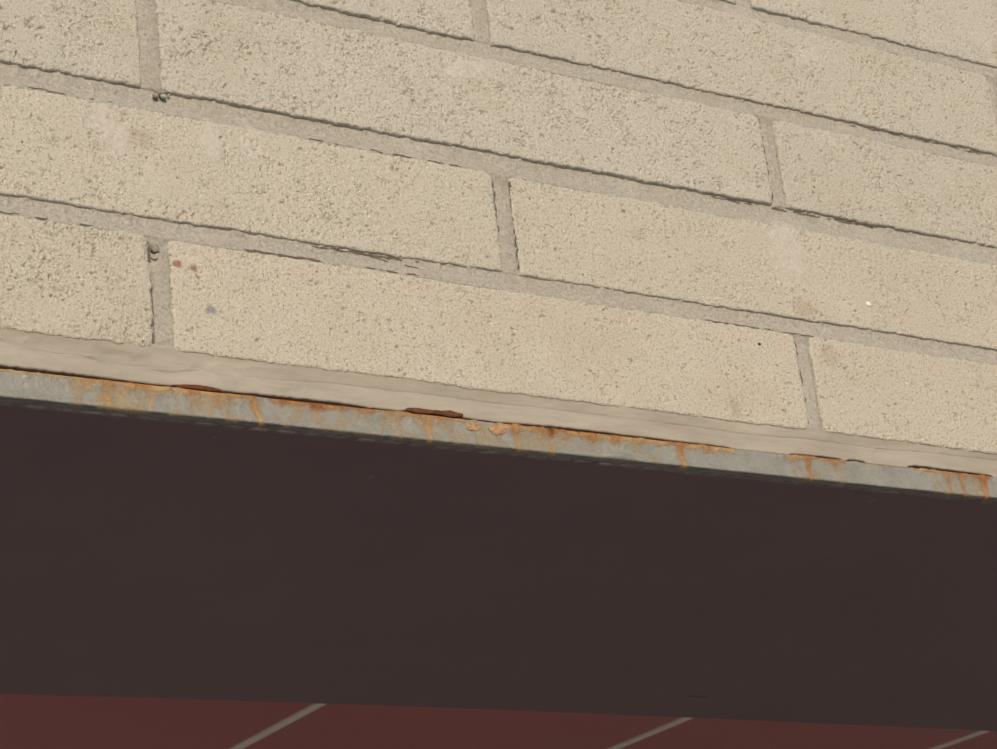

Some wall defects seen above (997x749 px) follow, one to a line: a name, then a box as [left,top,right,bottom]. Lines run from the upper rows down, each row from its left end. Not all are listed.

corrosion [0,369,263,428]
corrosion [270,398,465,444]
corrosion [502,423,734,470]
corrosion [787,454,845,482]
corrosion [895,466,991,501]